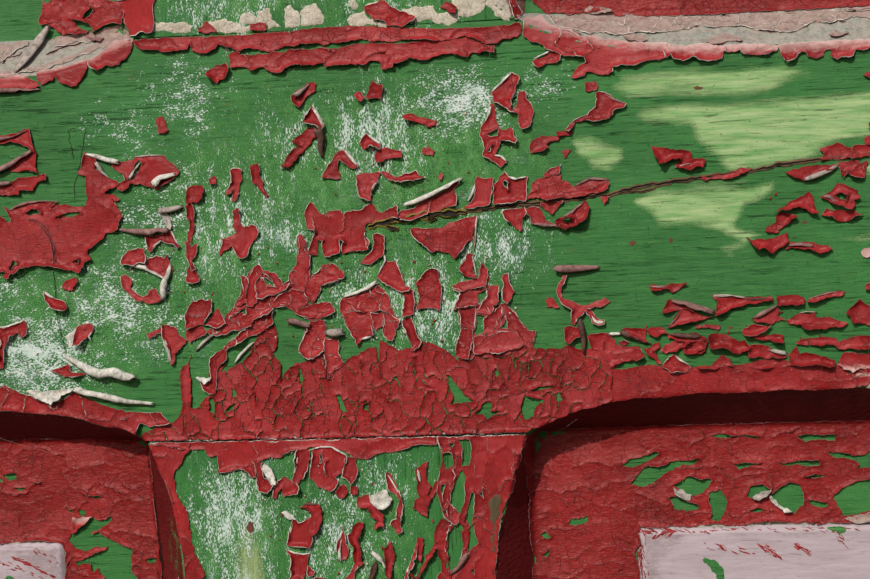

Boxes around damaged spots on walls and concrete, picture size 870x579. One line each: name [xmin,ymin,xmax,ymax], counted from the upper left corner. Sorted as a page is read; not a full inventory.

crack [694,8,870,34]
peeling [0,0,870,154]
peeling [0,128,216,311]
peeling [280,105,359,180]
peeling [360,133,402,162]
peeling [464,72,610,232]
crack [368,152,870,231]
peeling [651,145,751,181]
peeling [747,135,870,254]
peeling [0,164,870,579]
crack [150,431,526,444]